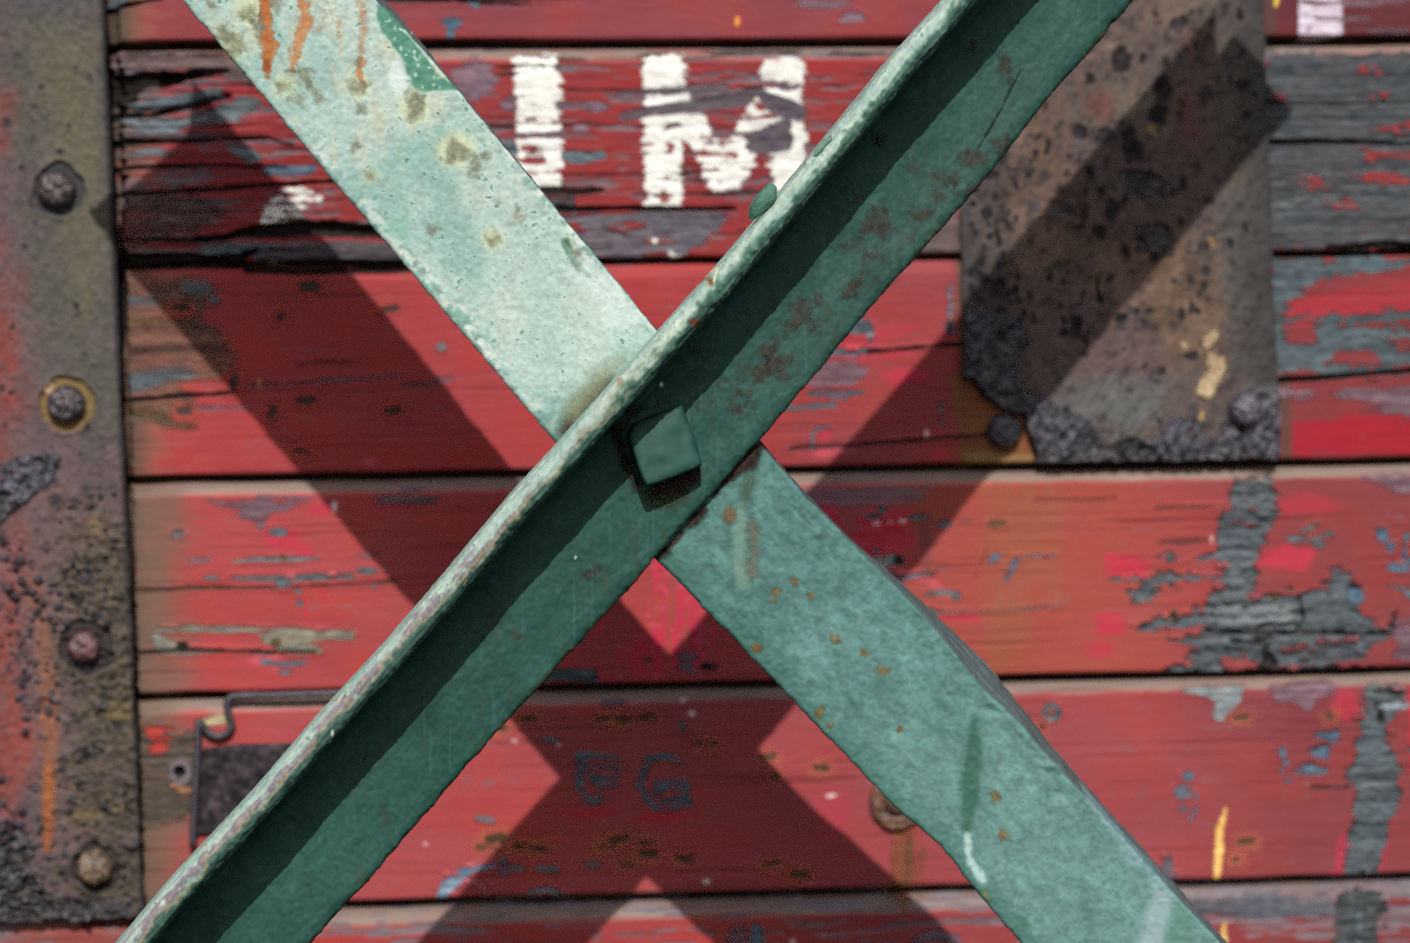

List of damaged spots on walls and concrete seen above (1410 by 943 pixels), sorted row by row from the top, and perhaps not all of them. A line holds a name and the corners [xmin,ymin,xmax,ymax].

corrosion [259,0,313,73]
peeling [797,1,865,23]
peeling [1340,0,1409,34]
crack [112,137,334,199]
peeling [1265,50,1410,416]
corrosion [964,309,1281,464]
corrosion [0,452,60,525]
peeling [1110,473,1410,943]
corrosion [0,763,102,923]